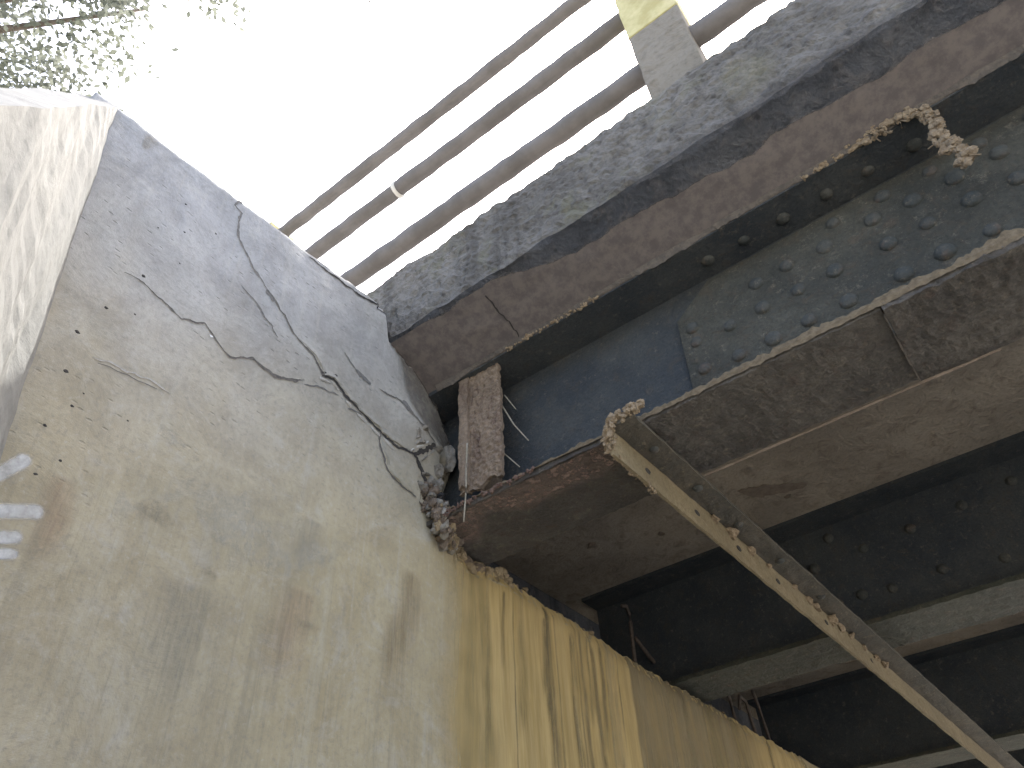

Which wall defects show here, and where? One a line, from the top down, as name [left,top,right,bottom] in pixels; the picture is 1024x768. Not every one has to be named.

crack [93,357,168,392]
crack [125,201,436,497]
crack [485,295,519,337]
spalling [416,422,528,593]
water stain [455,561,804,768]